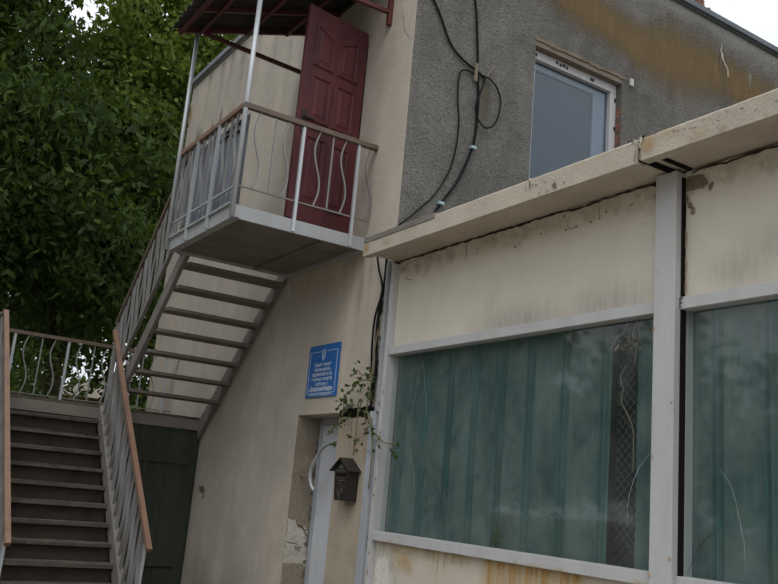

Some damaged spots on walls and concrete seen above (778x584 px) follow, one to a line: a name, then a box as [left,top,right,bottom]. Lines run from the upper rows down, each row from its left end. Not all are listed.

spalling [686,174,714,214]
flaking render [283,506,312,584]